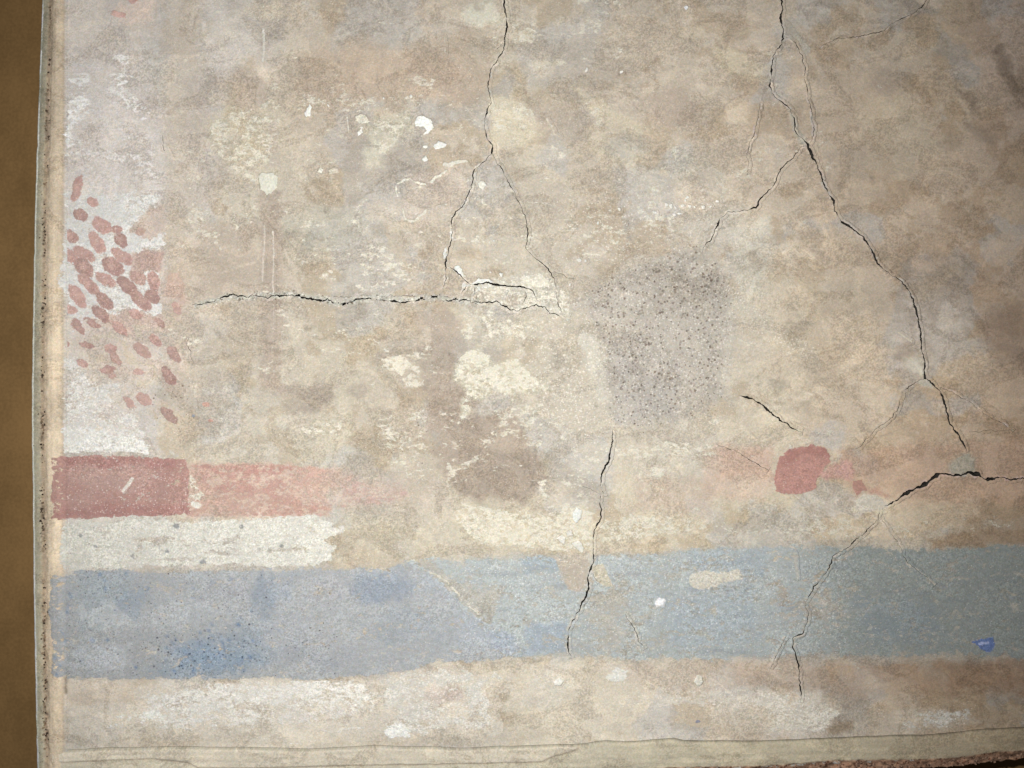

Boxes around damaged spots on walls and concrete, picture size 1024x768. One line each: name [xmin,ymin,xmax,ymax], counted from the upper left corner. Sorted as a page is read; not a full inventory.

crack [192,0,574,322]
crack [700,0,1024,702]
crack [564,430,616,659]